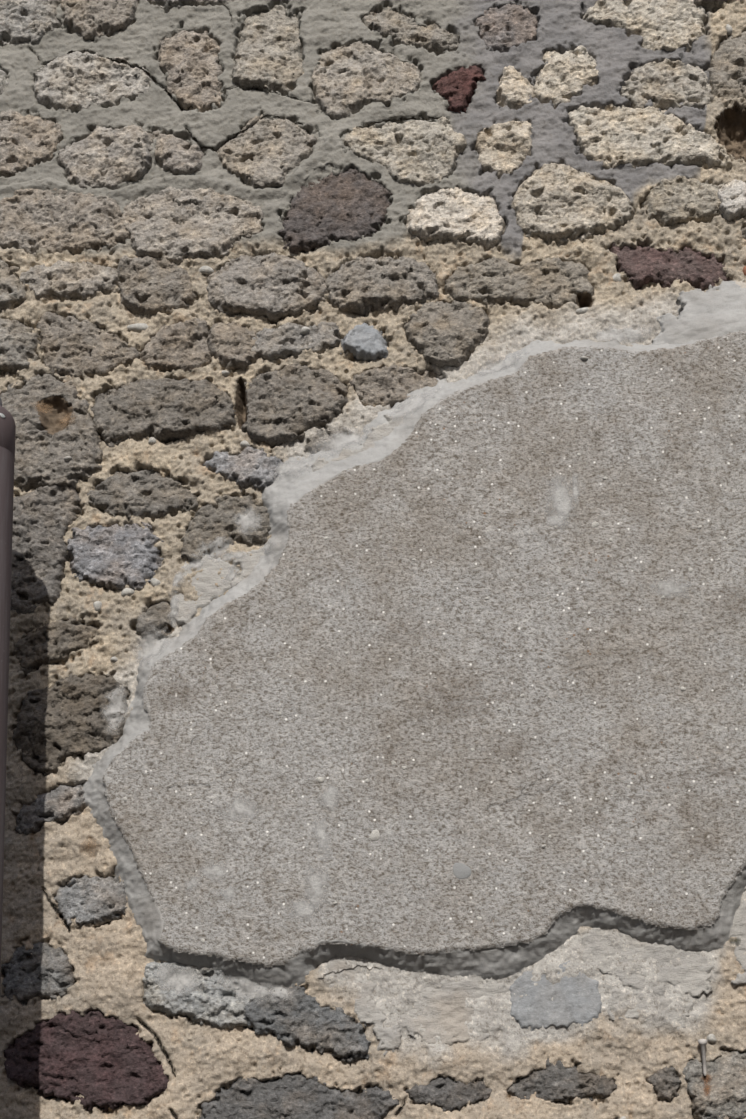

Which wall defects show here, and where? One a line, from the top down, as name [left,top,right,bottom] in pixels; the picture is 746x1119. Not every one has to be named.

crack [29,47,312,152]
hole [715,105,746,162]
peeling [318,956,515,1055]
peeling [581,928,714,1030]